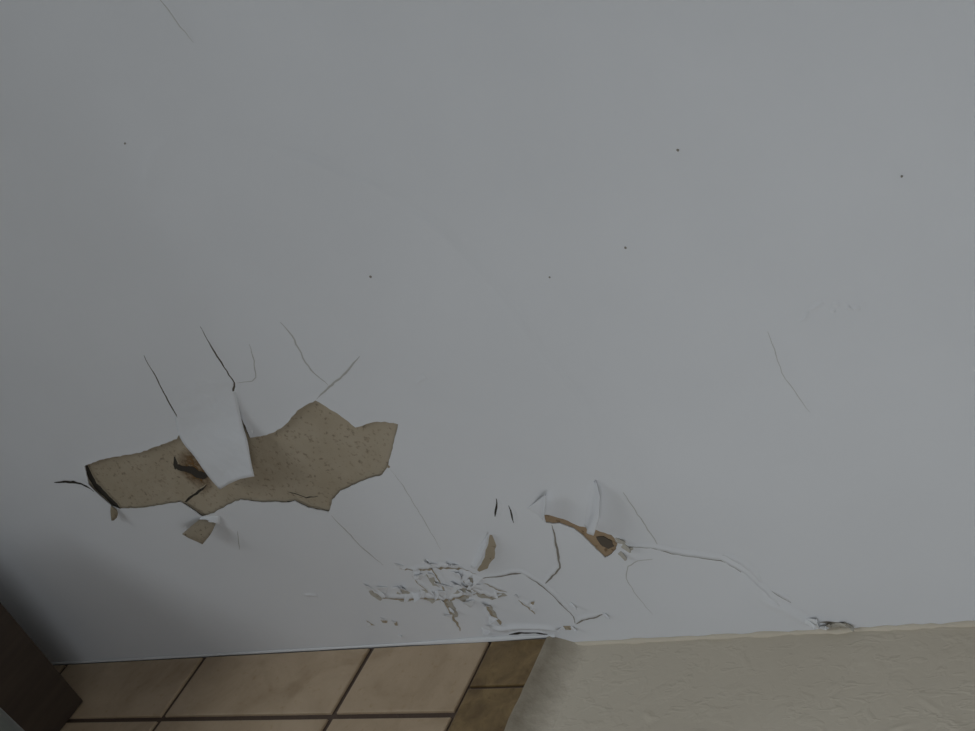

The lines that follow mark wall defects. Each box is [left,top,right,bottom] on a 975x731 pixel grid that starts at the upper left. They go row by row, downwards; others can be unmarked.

crack [144,355,178,416]
crack [200,326,256,438]
crack [280,322,360,401]
peeling [77,380,408,544]
peeling [527,480,633,562]
peeling [364,533,537,636]